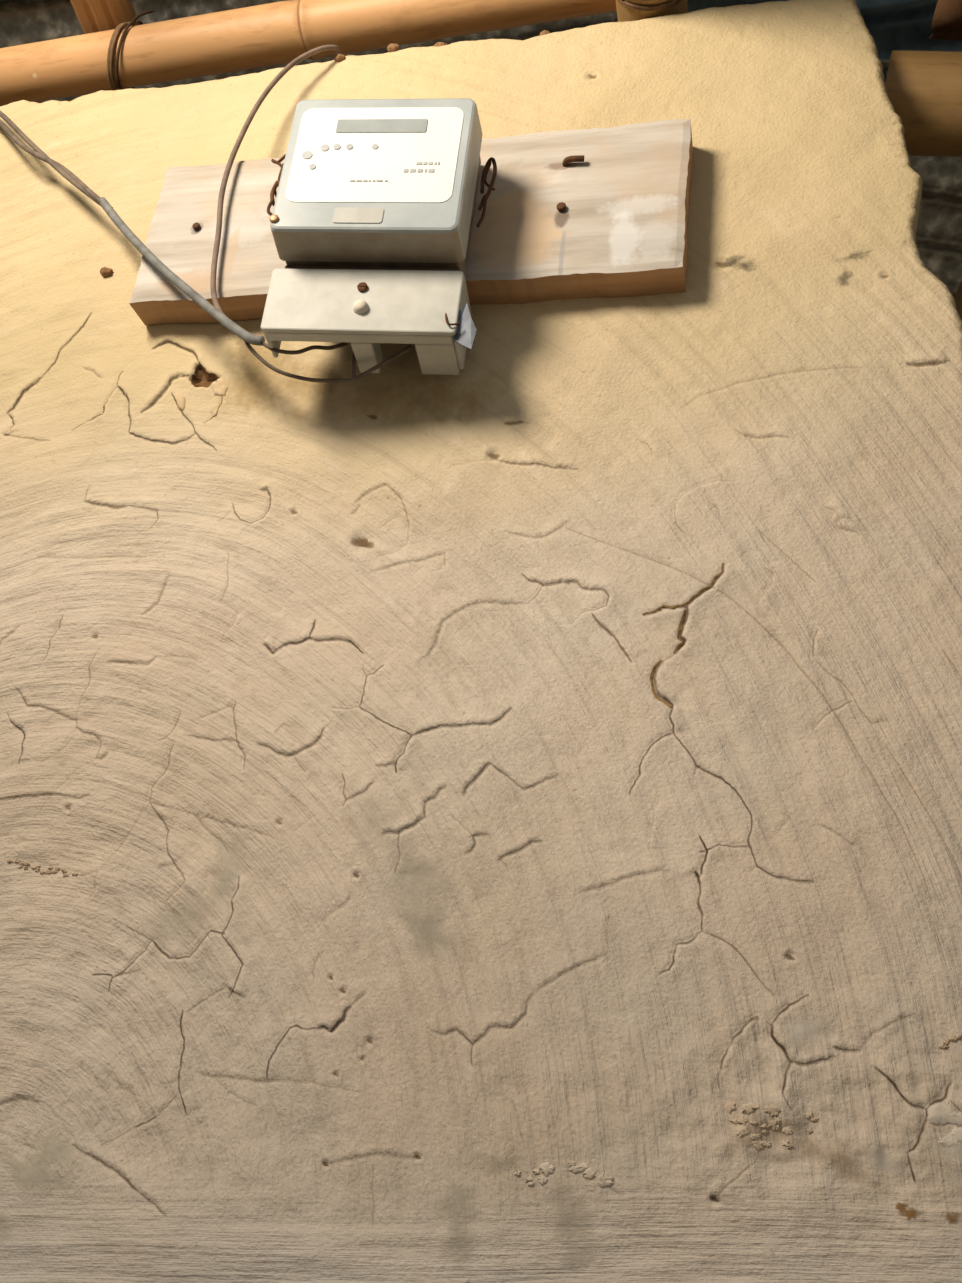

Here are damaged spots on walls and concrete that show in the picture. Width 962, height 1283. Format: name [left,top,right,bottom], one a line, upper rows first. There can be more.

crack [4,313,91,439]
crack [72,341,223,449]
crack [11,690,57,760]
crack [265,620,511,771]
crack [524,563,814,973]
crack [92,886,243,997]
crack [135,1009,190,1127]
crack [266,1005,351,1074]
crack [717,994,844,1107]
crack [878,1069,962,1182]